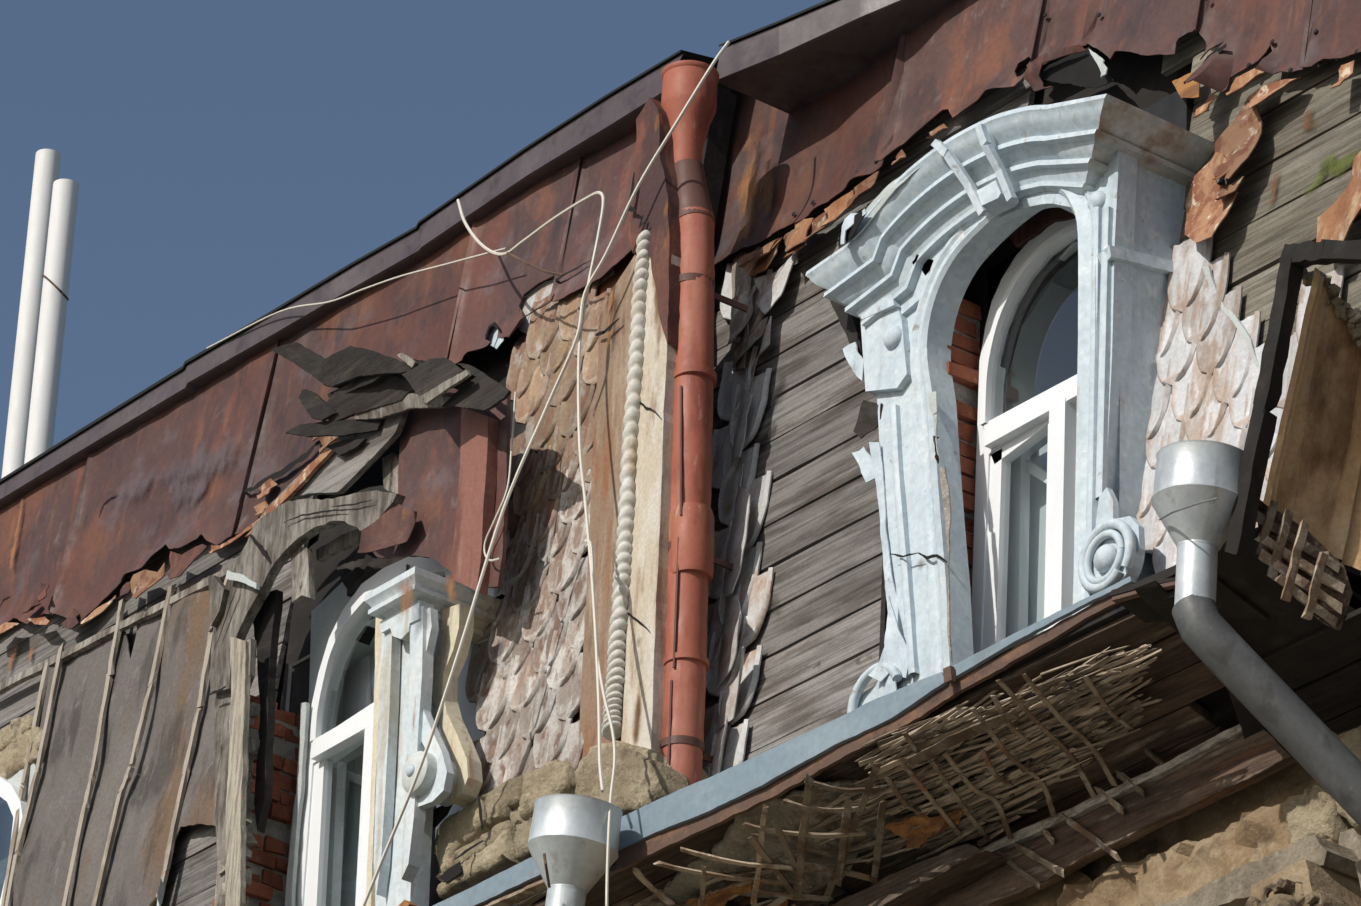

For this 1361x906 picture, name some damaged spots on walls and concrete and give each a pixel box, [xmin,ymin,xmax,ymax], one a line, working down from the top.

peeling [1331,60,1355,89]
rust [739,139,772,236]
peeling [738,149,906,267]
peeling [1185,68,1301,243]
peeling [1316,151,1361,242]
peeling [120,445,233,502]
peeling [312,436,338,453]
peeling [80,478,278,626]
crack [890,552,947,568]
peeling [0,583,50,635]
spalling [246,702,260,903]
spalling [217,857,226,896]